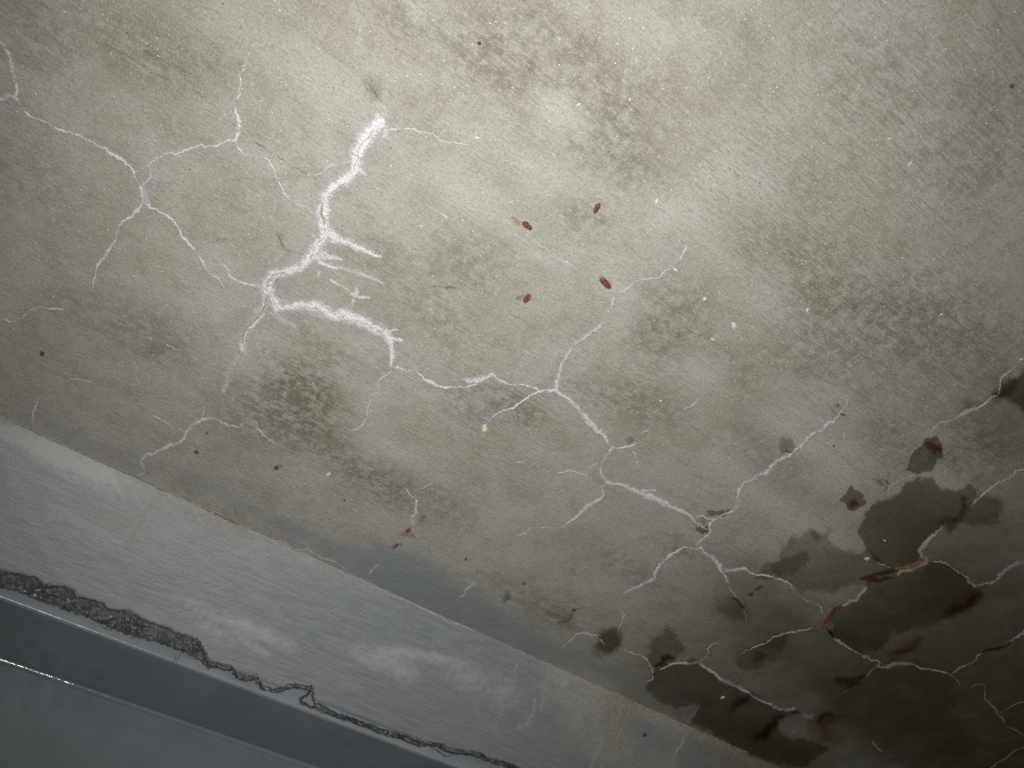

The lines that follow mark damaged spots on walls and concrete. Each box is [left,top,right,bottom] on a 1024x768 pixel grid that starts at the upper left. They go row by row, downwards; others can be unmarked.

crack [0,41,19,102]
crack [3,306,64,323]
crack [23,57,869,598]
crack [931,362,1019,434]
crack [970,469,1024,508]
crack [562,612,625,648]
crack [742,526,1024,691]
crack [624,643,813,734]
crack [972,684,1024,768]